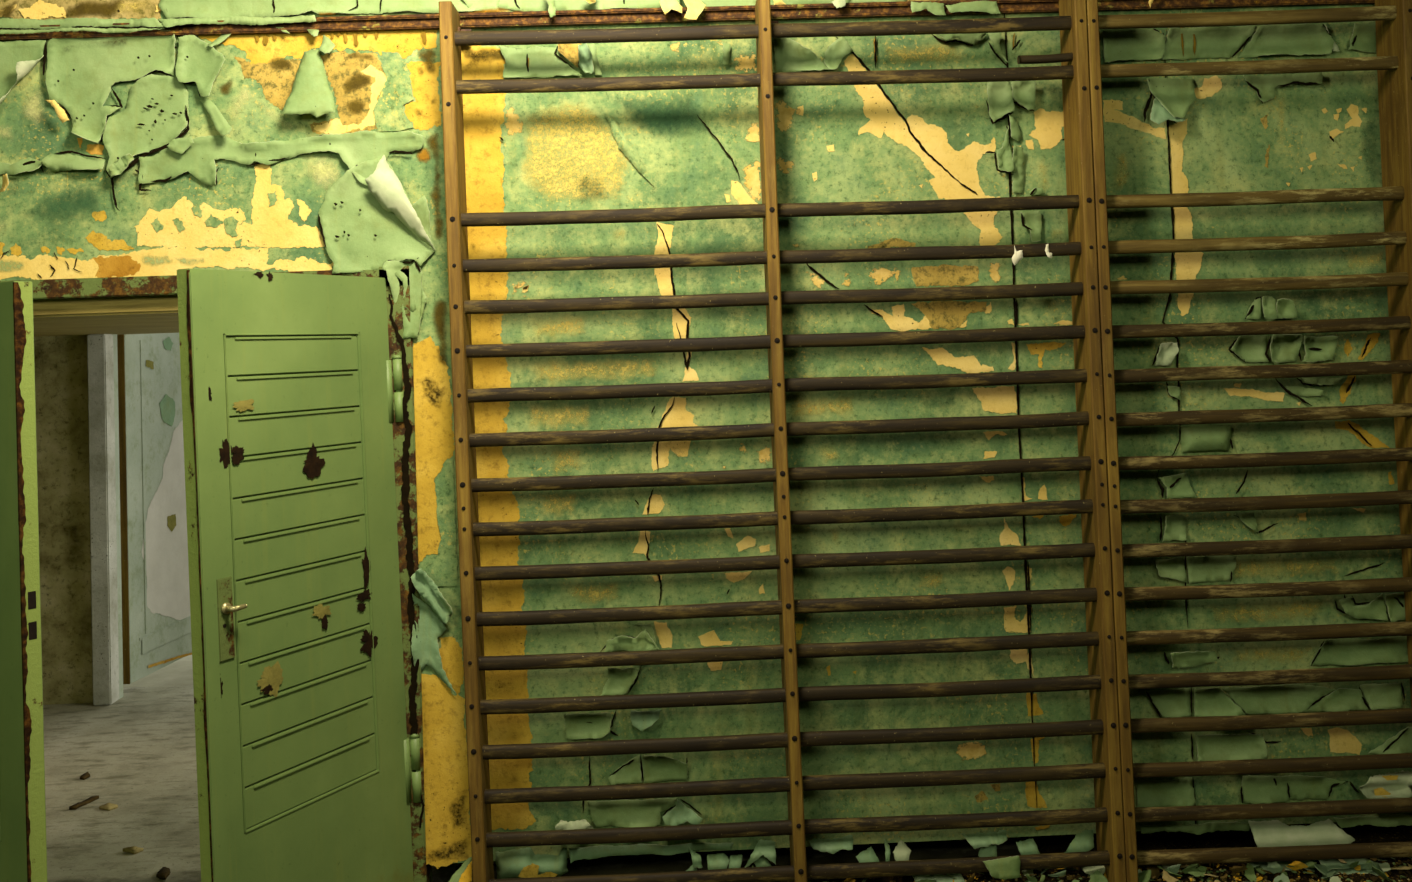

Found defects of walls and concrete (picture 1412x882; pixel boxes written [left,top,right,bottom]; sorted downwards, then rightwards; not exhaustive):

flaking render [774,37,1064,246]
peeling [1103,76,1222,316]
crack [635,224,691,605]
crack [824,14,1037,805]
flaking render [869,262,1001,331]
flaking render [922,342,1065,414]
crack [1143,29,1188,624]
crack [1230,439,1278,533]
crack [565,635,643,811]
crack [1310,563,1404,709]
peeling [809,835,965,882]
peeling [961,825,1050,880]